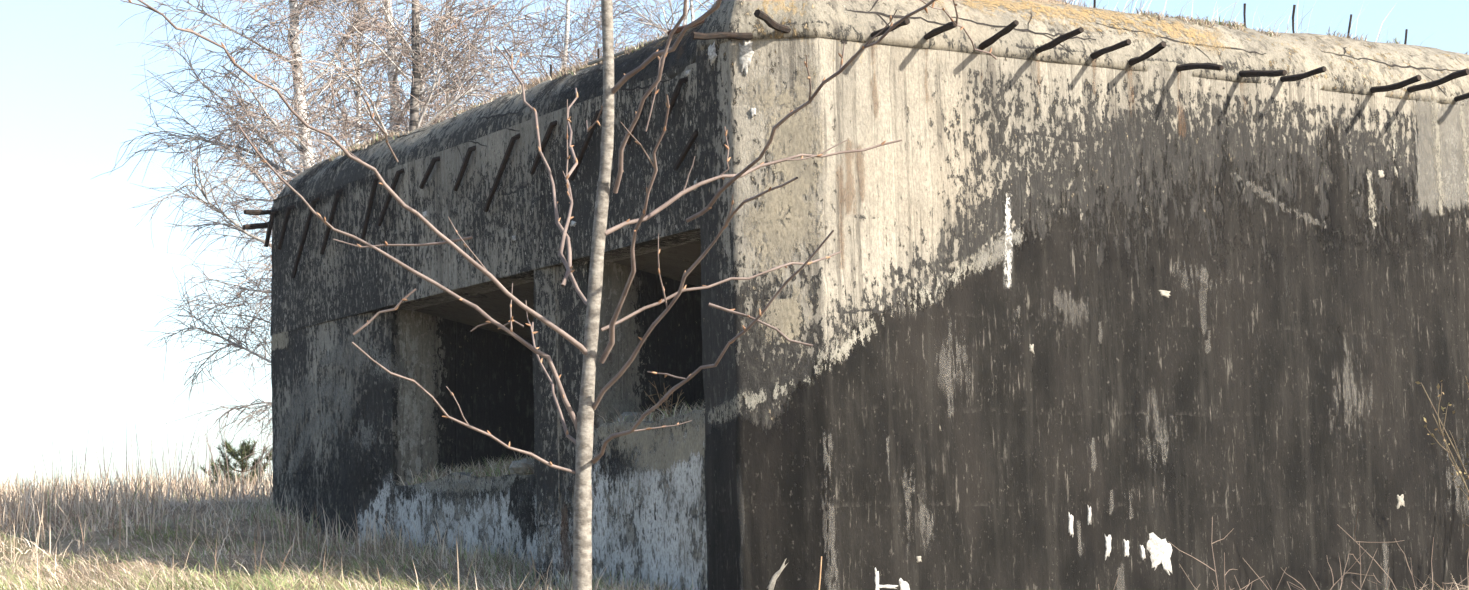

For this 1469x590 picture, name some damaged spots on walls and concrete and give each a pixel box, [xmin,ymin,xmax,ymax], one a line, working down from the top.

corrosion [937,0,1224,51]
leakage [271,149,383,220]
leakage [271,331,289,352]
leakage [591,96,1469,590]
leakage [274,418,574,589]
peeling [1068,506,1092,537]
peeling [766,558,788,590]
peeling [875,567,910,590]
peeling [1105,533,1172,575]